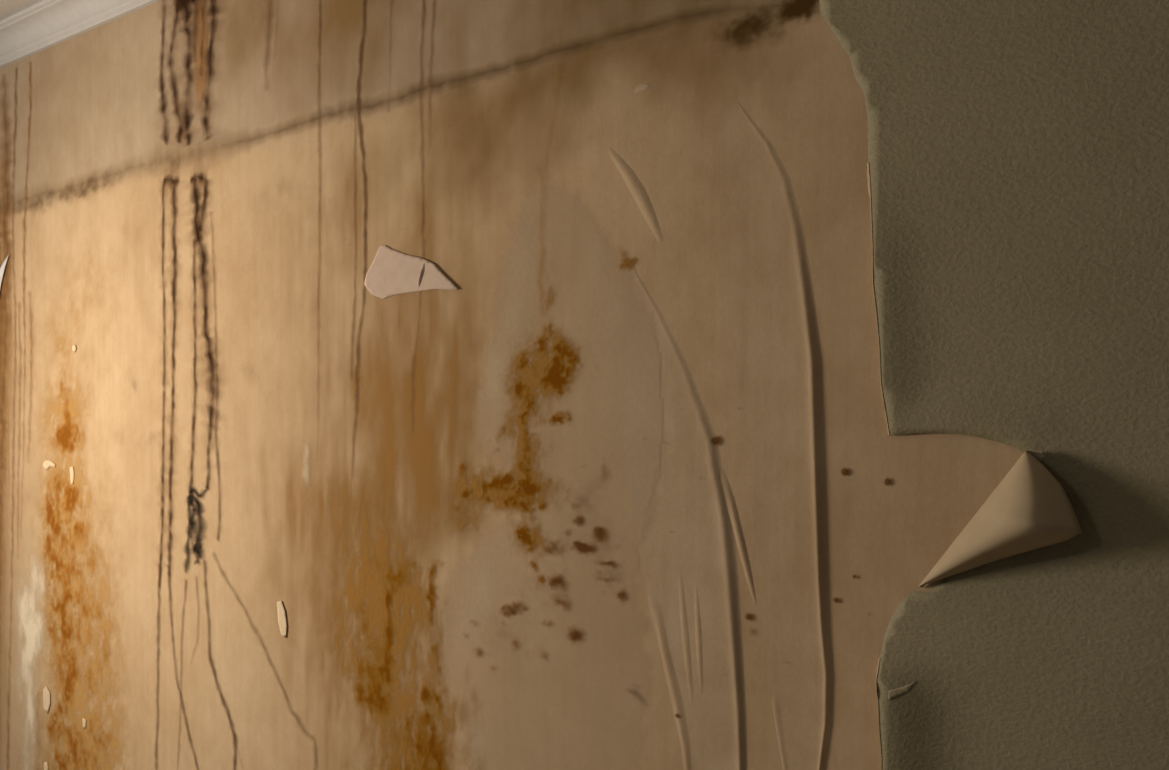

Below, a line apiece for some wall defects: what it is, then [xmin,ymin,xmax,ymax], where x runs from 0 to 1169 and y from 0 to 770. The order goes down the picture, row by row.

leakage [160,0,216,144]
leakage [726,0,816,45]
peeling [17,561,45,770]
corrosion [41,374,123,770]
leakage [160,441,172,566]
leakage [162,175,218,572]
peeling [277,601,287,638]
leakage [288,289,475,586]
corrosion [335,497,454,770]
peeling [364,245,459,299]
corrosion [455,324,579,530]
corrosion [515,525,545,583]